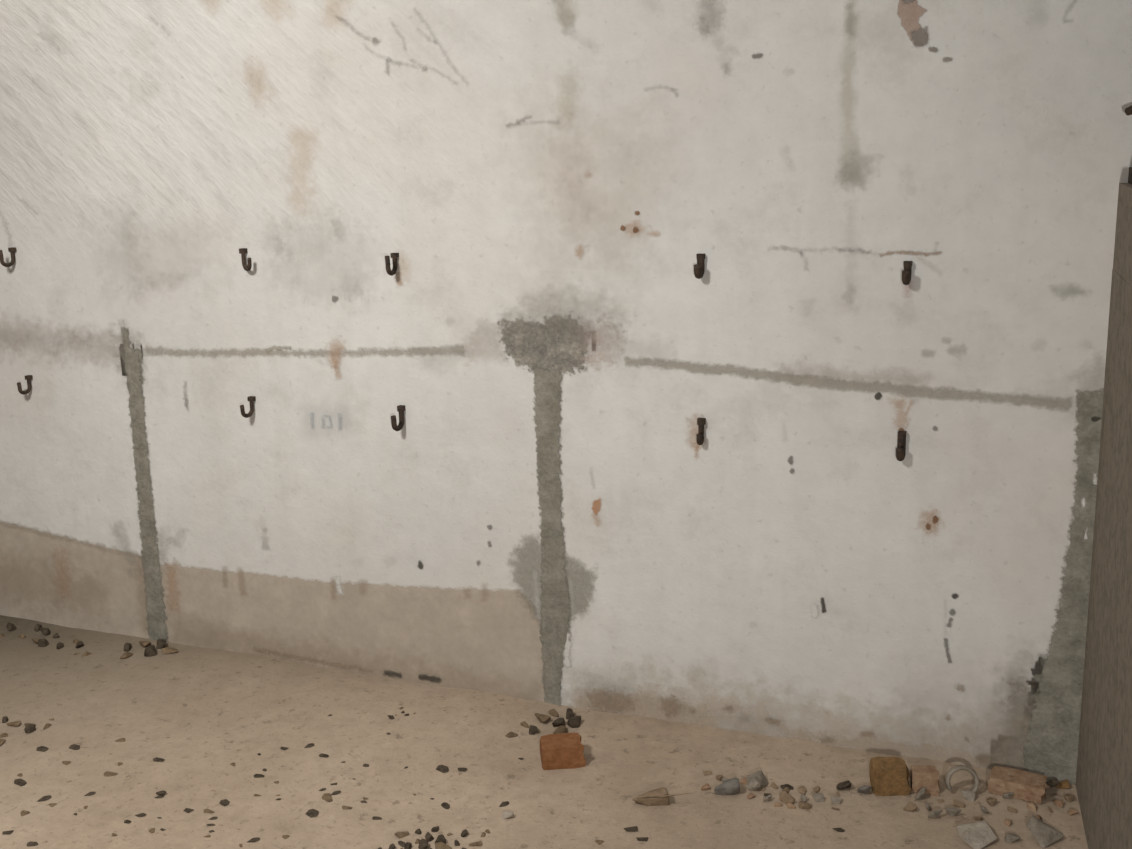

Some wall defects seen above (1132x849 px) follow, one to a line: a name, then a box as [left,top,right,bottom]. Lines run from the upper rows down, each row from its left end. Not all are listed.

spalling [898,0,952,62]